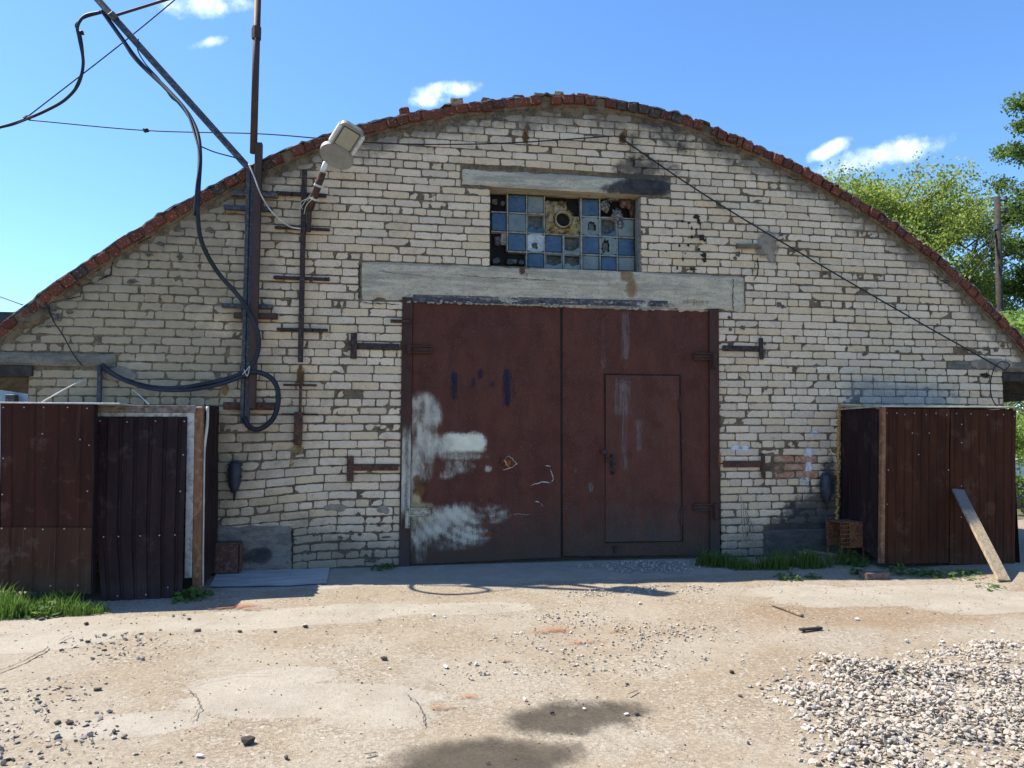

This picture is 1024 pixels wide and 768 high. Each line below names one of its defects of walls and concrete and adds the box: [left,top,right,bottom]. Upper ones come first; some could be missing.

corrosion [620,271,635,296]
corrosion [411,475,432,508]